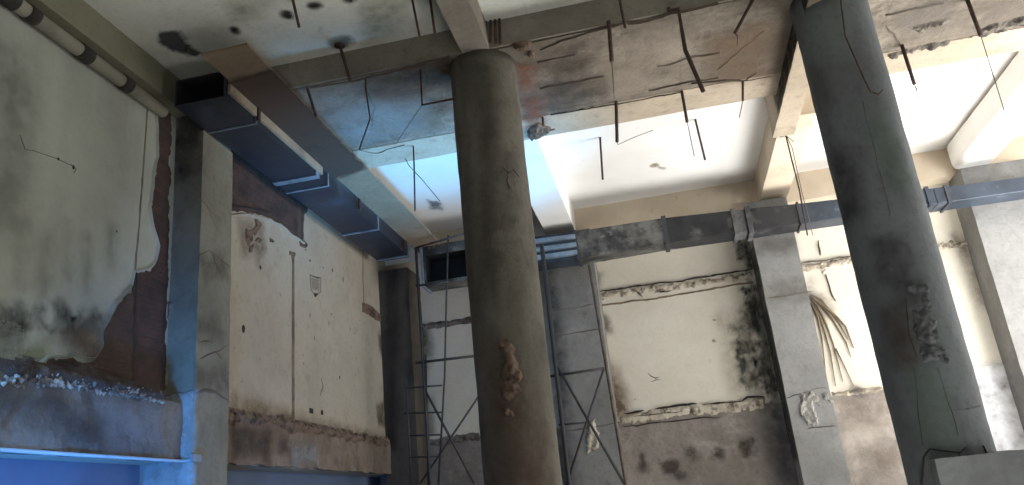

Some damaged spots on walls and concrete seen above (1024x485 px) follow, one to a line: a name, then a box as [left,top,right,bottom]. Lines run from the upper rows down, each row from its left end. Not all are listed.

leakage [159,32,200,56]
crack [307,55,450,154]
spalling [527,123,555,141]
flaking render [231,150,311,262]
peeling [0,113,173,402]
leakage [736,240,753,269]
leakage [736,283,778,403]
spalling [907,283,949,364]
spalling [228,407,390,447]
peeling [689,396,765,416]
spalling [799,391,834,427]